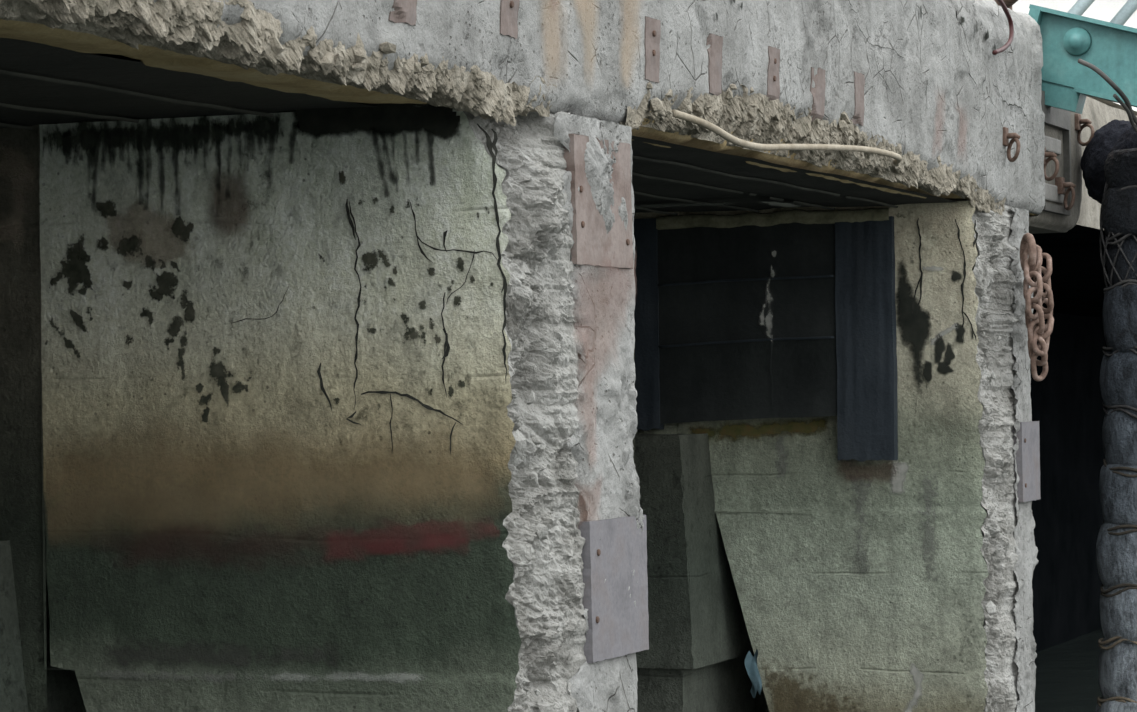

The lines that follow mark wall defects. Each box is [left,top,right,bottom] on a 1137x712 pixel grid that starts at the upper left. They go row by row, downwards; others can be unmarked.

damp [43,102,460,209]
spalling [0,0,591,712]
crack [317,123,507,454]
spalling [620,82,1020,712]
damp [896,261,973,391]